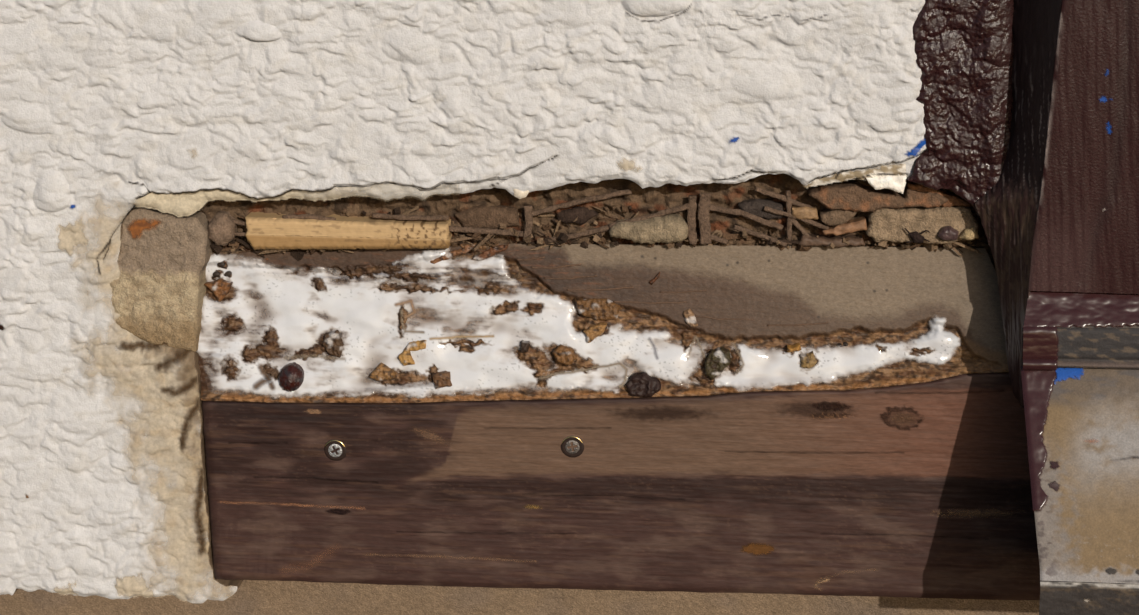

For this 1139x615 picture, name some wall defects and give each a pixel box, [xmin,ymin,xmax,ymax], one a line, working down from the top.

peeling [618,159,640,170]
spalling [805,163,907,194]
peeling [137,189,342,217]
flaking render [513,189,529,199]
water stain [121,342,190,371]
water stain [162,376,197,396]
water stain [180,403,199,450]
water stain [195,470,205,553]